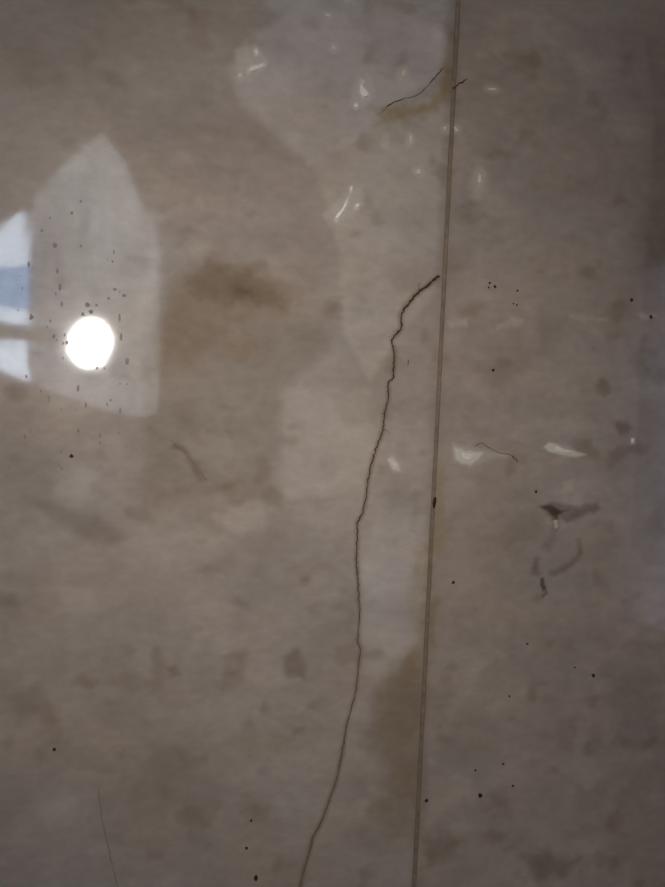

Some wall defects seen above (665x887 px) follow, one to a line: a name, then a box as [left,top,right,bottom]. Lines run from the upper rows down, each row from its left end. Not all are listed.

crack [379,68,467,114]
damp [132,245,302,386]
crack [296,270,442,887]
damp [360,641,439,833]